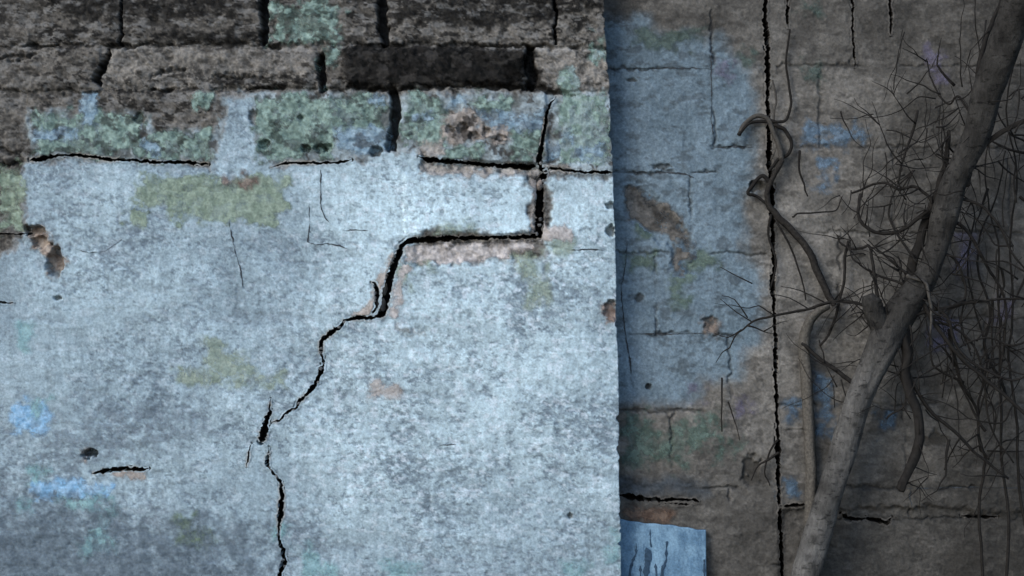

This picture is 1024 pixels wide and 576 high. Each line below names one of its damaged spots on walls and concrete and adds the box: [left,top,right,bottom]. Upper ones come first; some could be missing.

crack [29,151,211,168]
spalling [28,227,68,274]
spalling [352,108,573,318]
spalling [623,185,694,275]
crack [620,0,805,576]
crack [244,96,708,576]
crack [92,464,150,476]